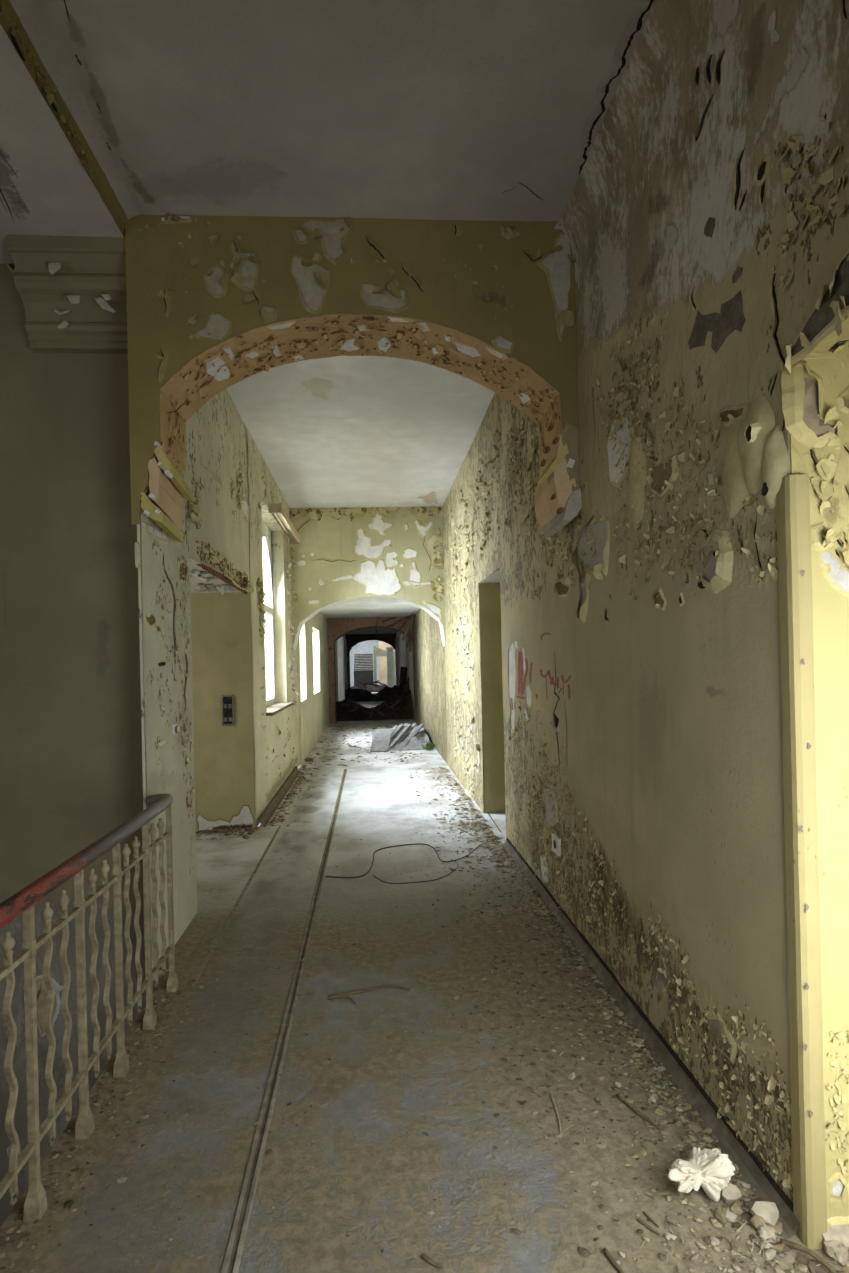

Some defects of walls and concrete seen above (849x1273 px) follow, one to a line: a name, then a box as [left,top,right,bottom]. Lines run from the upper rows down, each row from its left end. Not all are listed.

peeling [756,121,848,292]